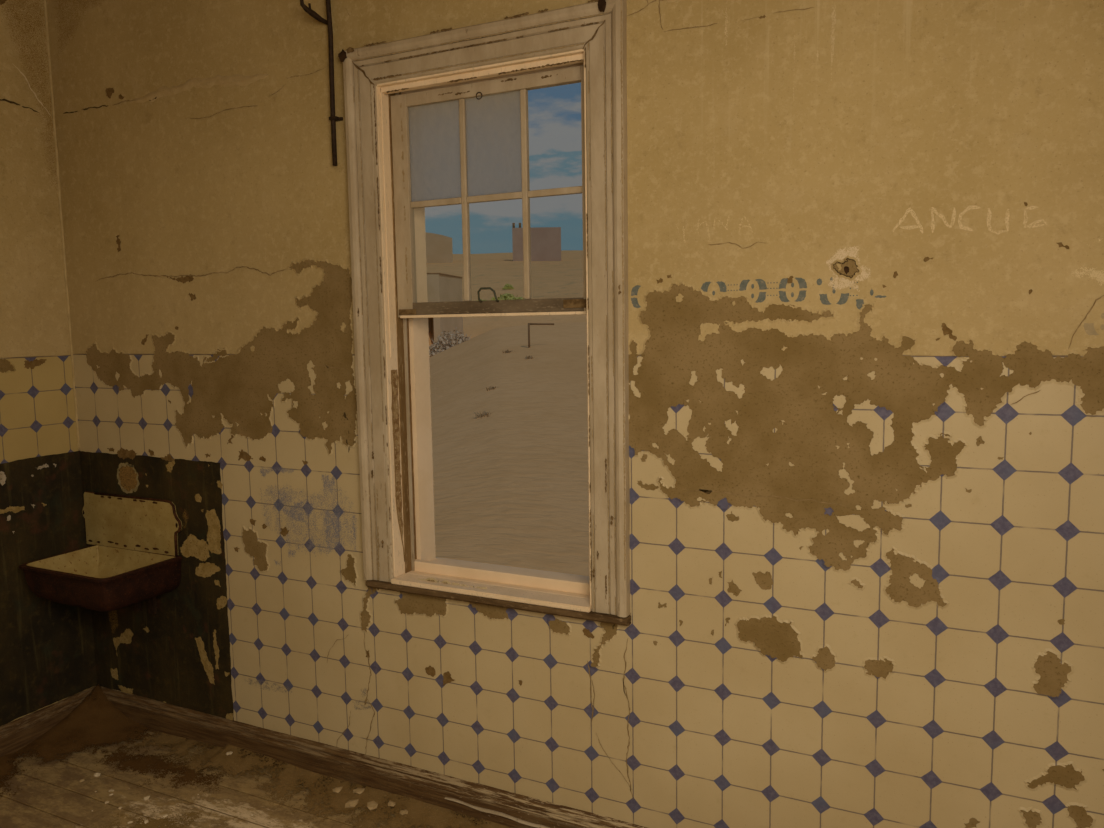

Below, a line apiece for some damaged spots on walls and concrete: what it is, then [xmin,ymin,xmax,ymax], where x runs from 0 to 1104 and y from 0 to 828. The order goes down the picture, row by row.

crack [627,0,814,32]
crack [0,97,157,114]
crack [97,266,285,281]
spalling [830,256,862,281]
spalling [85,0,604,634]
spalling [547,49,621,669]
spalling [628,275,1104,610]
spalling [711,613,838,673]
spalling [862,656,896,681]
spalling [1030,648,1074,699]
spalling [1017,807,1045,828]
spalling [1024,761,1096,828]